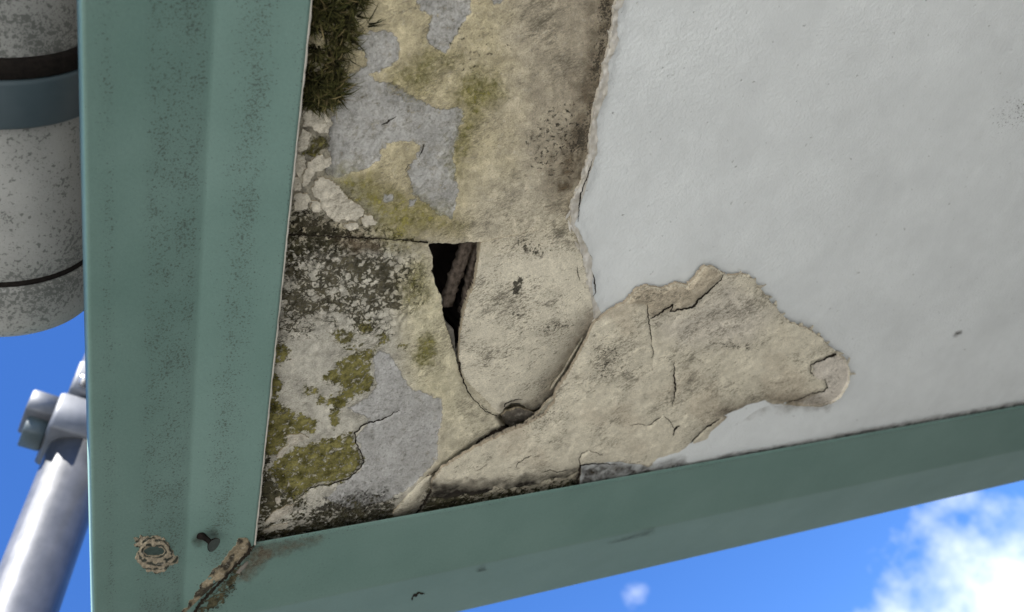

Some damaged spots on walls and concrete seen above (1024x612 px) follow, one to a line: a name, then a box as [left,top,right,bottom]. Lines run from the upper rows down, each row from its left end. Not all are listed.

peeling [416,0,471,53]
peeling [293,30,464,231]
crack [578,159,593,221]
peeling [263,496,294,533]
peeling [276,433,309,458]
damp [252,451,399,547]
crack [300,410,400,496]
crack [458,362,522,446]
damp [411,463,679,513]
peeling [325,264,856,517]
crack [629,275,727,443]
crack [787,353,837,403]